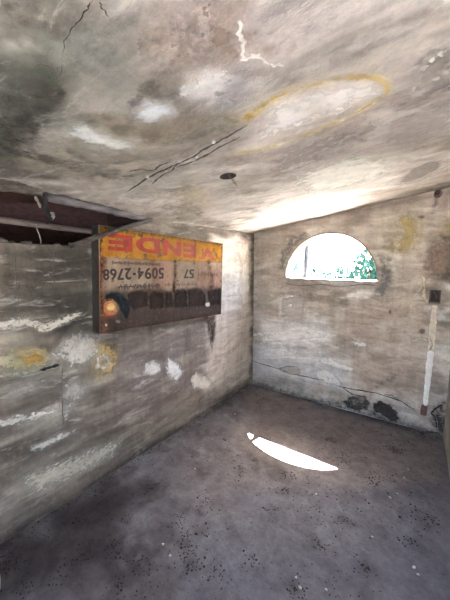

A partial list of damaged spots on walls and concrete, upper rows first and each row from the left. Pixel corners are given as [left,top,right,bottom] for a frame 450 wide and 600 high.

crack [33,0,108,79]
crack [126,125,247,192]
damp [273,122,377,170]
crack [253,361,415,410]